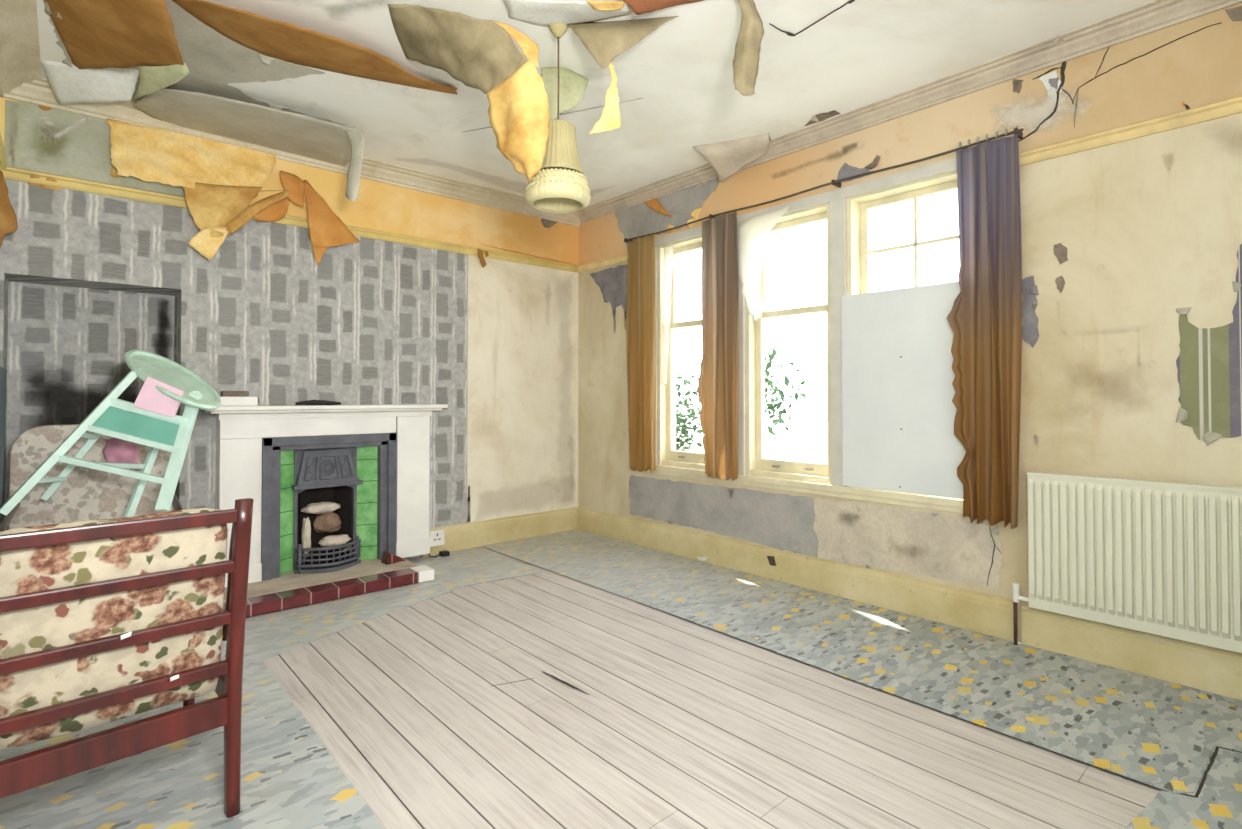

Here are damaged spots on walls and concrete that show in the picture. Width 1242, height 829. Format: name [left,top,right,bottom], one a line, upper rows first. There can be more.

peeling [43,0,73,67]
peeling [121,65,146,102]
peeling [165,0,352,128]
spalling [1012,79,1024,94]
peeling [4,100,185,206]
peeling [590,178,719,320]
spalling [1022,275,1039,348]